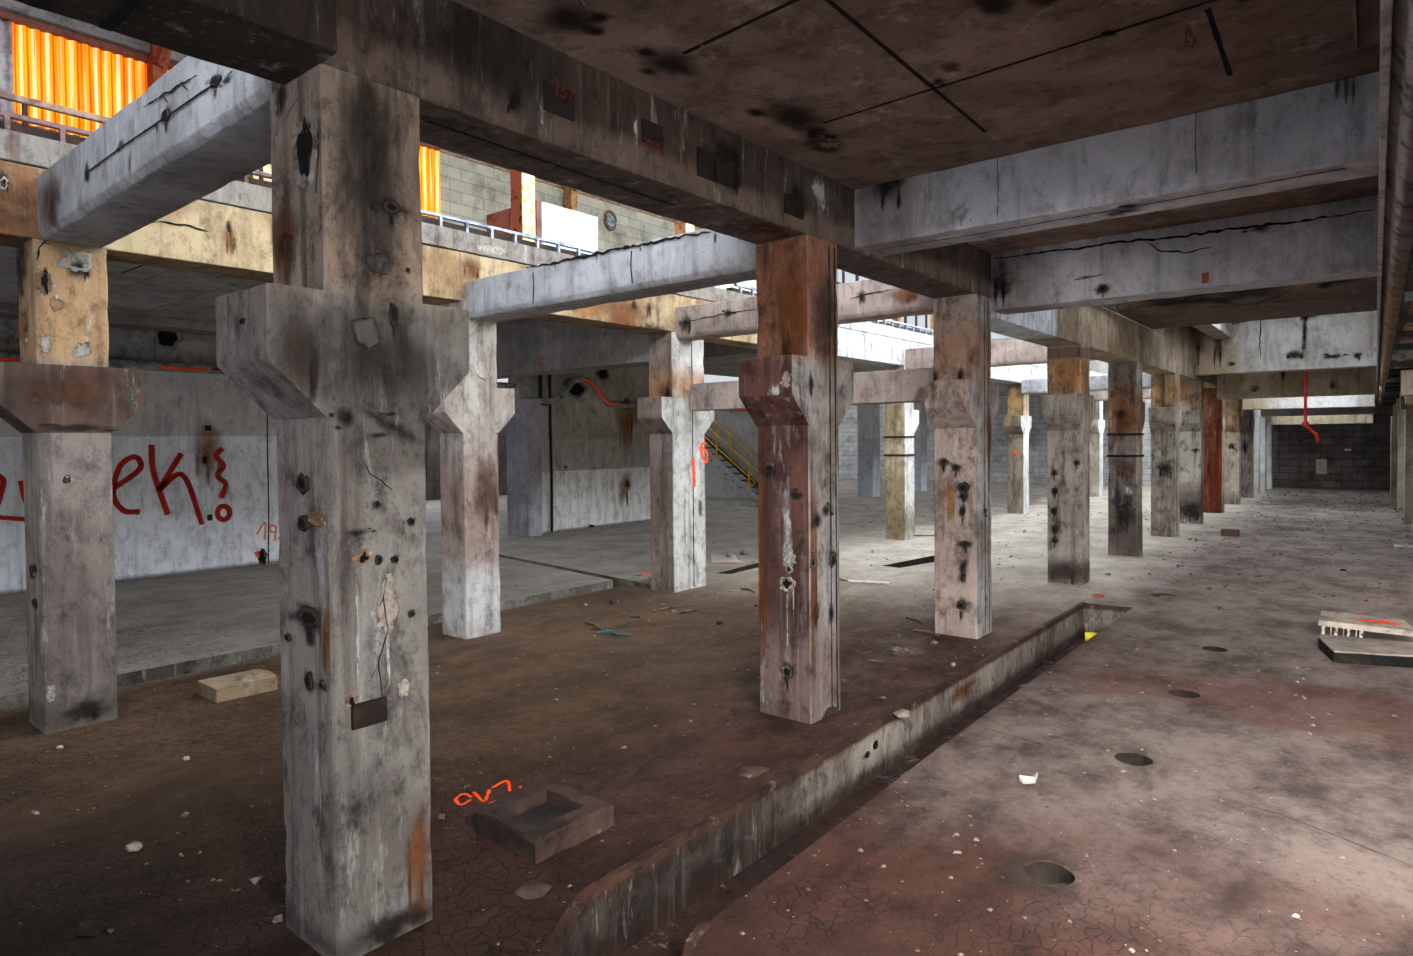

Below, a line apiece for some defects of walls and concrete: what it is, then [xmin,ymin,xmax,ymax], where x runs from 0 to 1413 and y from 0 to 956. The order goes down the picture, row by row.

crack [86,75,213,174]
crack [883,112,1372,259]
spalling [398,678,410,697]
corrosion [409,815,428,908]